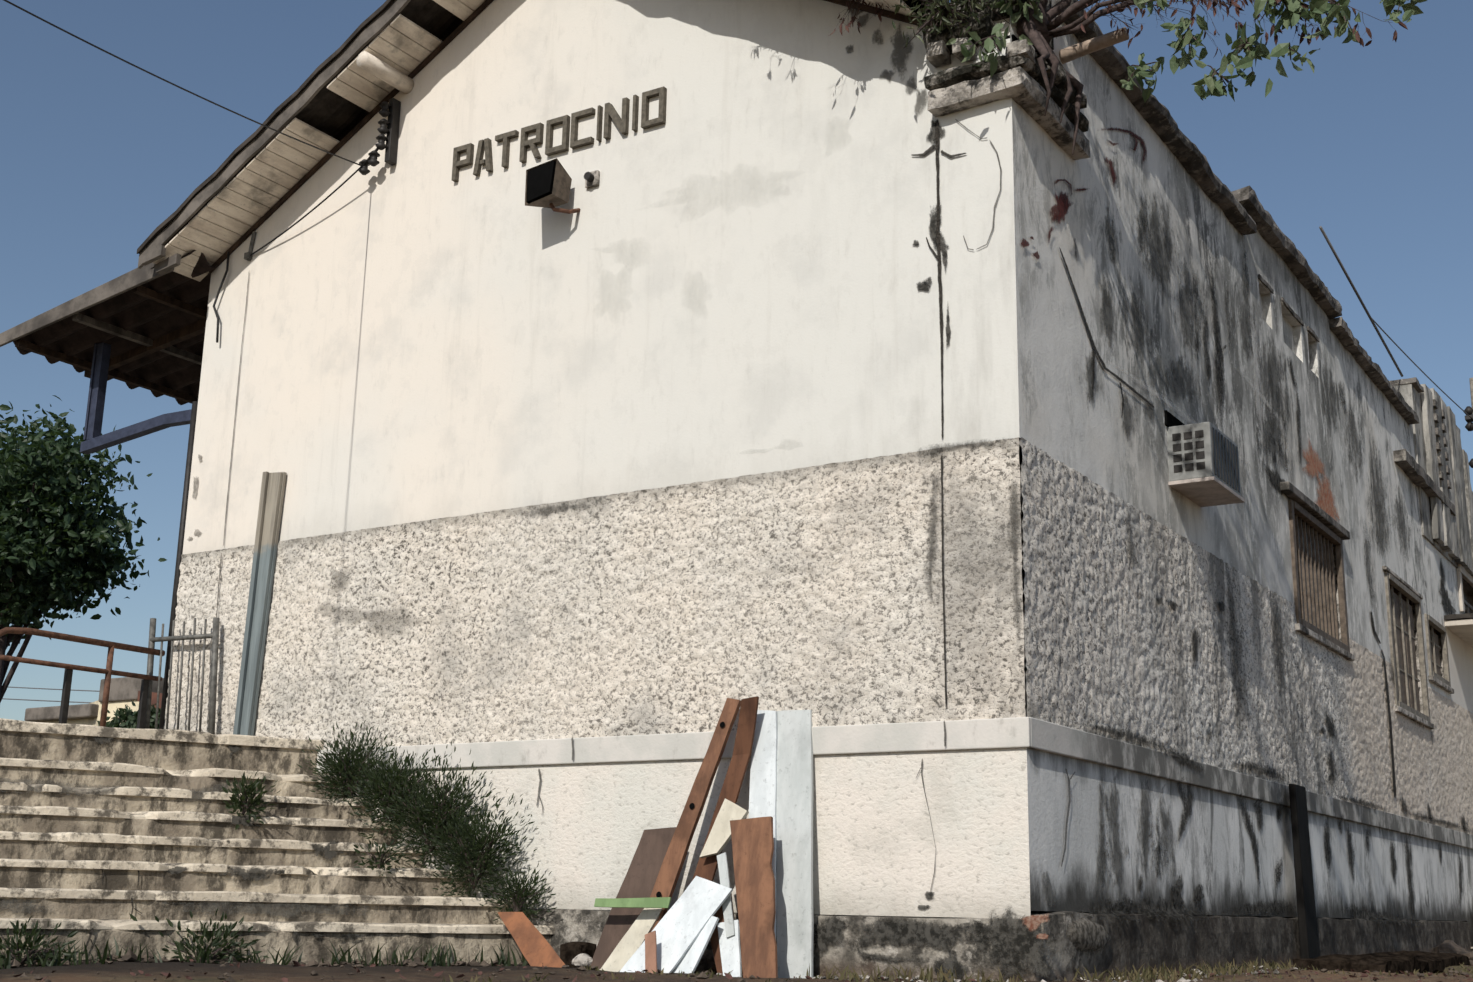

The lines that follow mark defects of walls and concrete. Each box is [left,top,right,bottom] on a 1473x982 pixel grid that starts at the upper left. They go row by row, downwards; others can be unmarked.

leakage [1100,197,1302,499]
leakage [926,477,938,590]
leakage [919,440,993,456]
crack [912,119,1002,892]
spalling [1303,446,1339,520]
leakage [1322,367,1411,605]
leakage [1439,559,1456,615]
leakage [1192,629,1200,661]
leakage [182,784,229,802]
leakage [1076,723,1296,924]
leakage [1321,711,1470,926]
leakage [165,901,367,918]